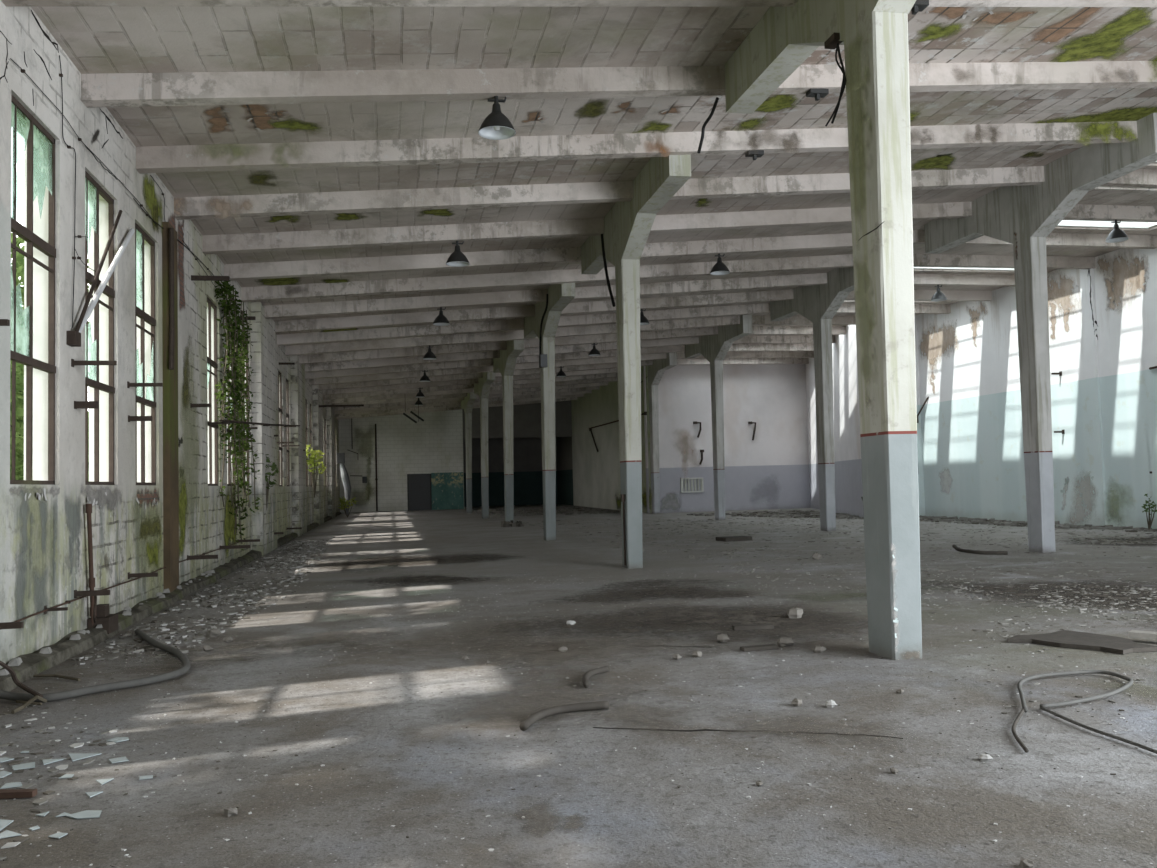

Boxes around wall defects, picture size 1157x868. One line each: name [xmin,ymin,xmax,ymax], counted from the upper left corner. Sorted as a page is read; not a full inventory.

crack [0,10,59,106]
spalling [205,104,287,133]
leakage [1079,121,1136,142]
leakage [16,491,81,622]